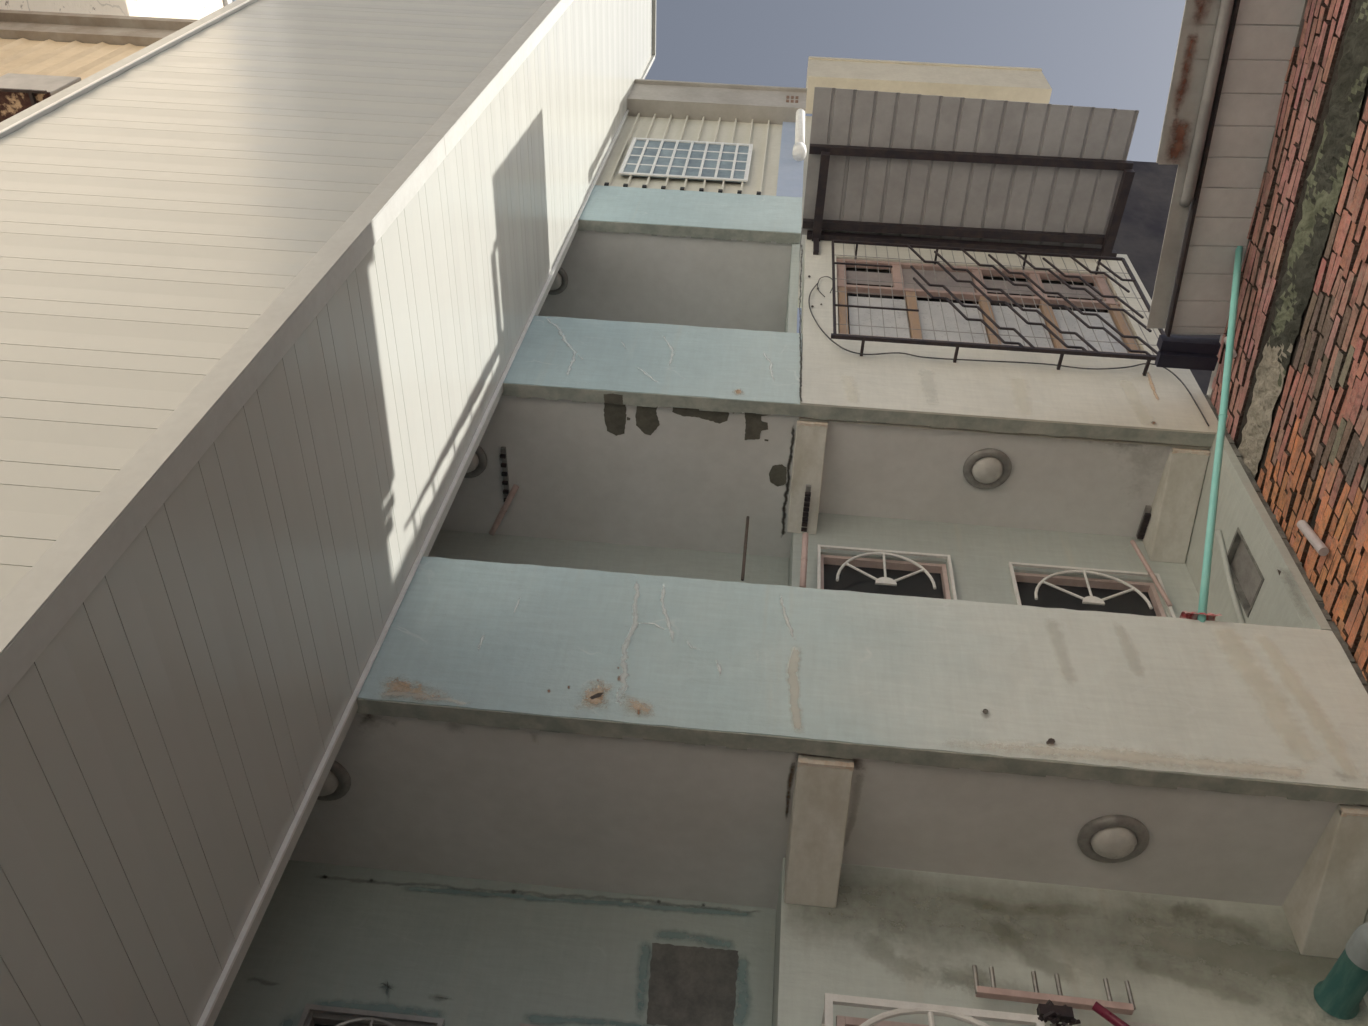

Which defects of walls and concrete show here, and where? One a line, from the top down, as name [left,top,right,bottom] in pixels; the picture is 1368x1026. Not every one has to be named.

rust [1169,37,1196,162]
peeling [603,393,768,441]
crack [764,245,803,535]
rust [568,667,620,704]
water stain [1118,916,1338,987]